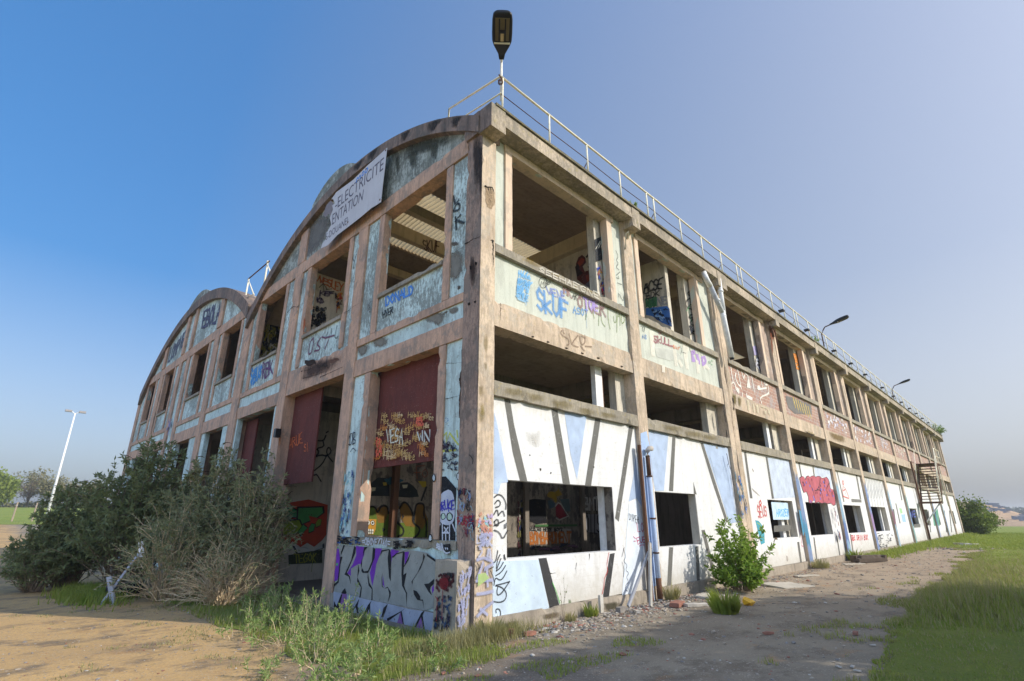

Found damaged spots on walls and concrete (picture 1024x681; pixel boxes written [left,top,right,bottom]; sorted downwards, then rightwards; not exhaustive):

water stain [396,120,449,172]
peeling [450,241,477,290]